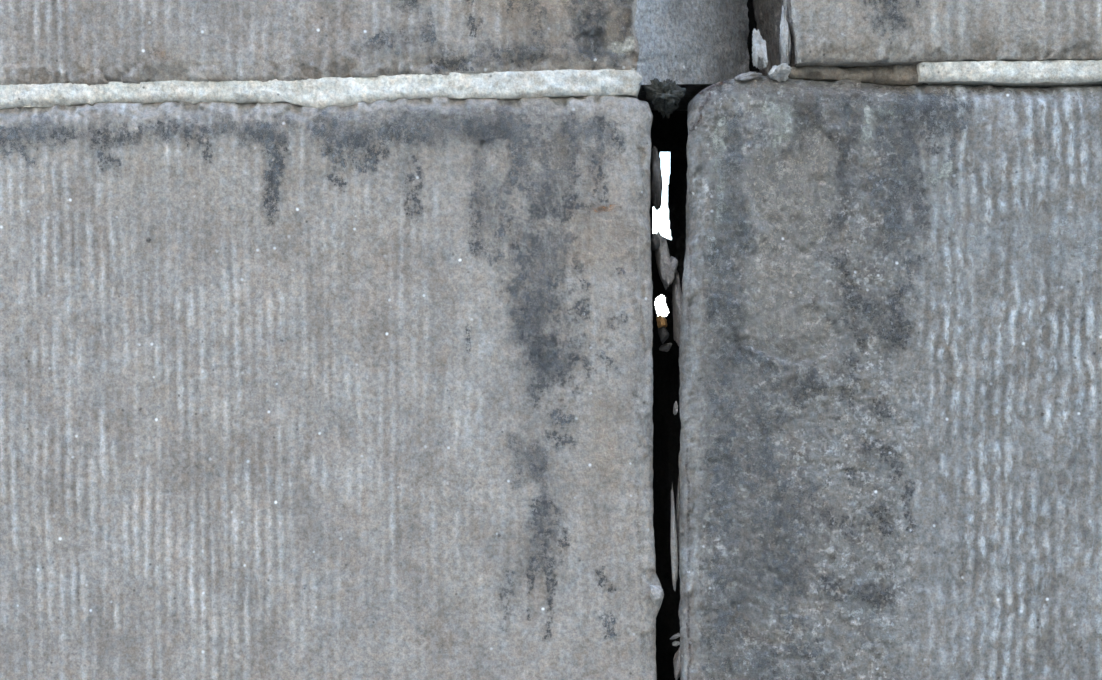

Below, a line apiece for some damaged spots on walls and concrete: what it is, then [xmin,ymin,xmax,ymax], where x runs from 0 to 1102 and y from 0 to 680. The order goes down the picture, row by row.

leakage [422,12,546,72]
leakage [562,0,633,67]
leakage [0,125,77,165]
leakage [91,124,143,171]
leakage [157,120,213,163]
leakage [528,112,624,223]
leakage [313,111,587,407]
leakage [716,80,1016,407]
leakage [702,106,898,680]
leakage [862,438,916,533]
leakage [500,492,570,639]